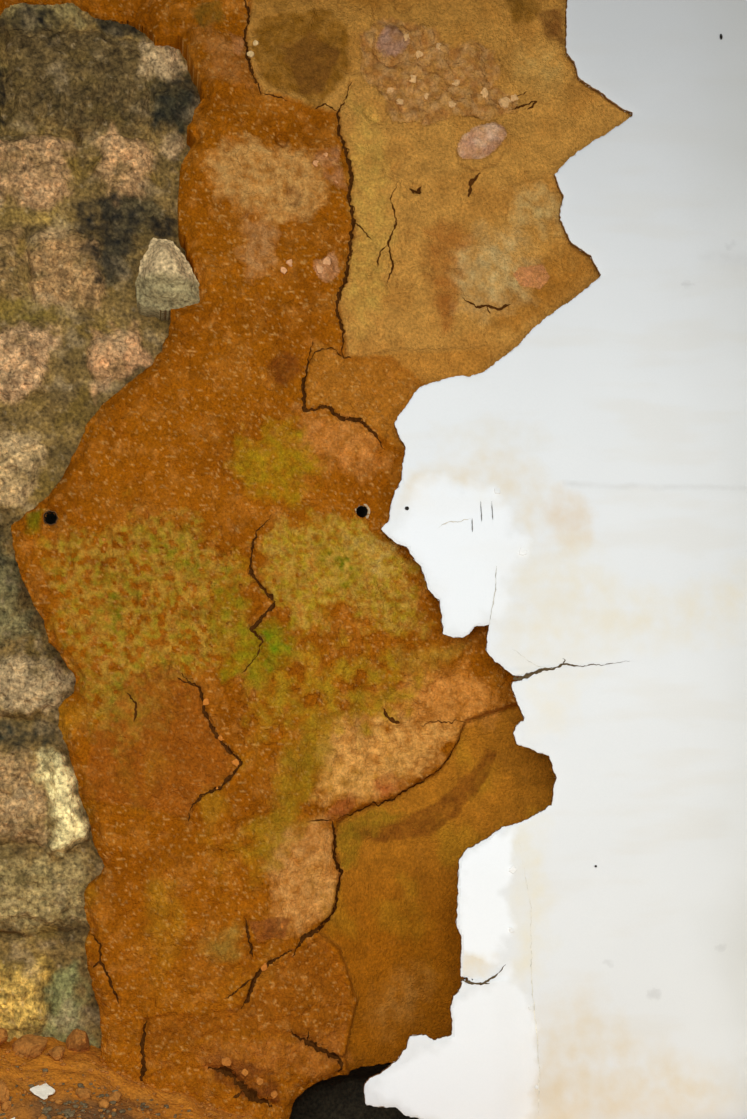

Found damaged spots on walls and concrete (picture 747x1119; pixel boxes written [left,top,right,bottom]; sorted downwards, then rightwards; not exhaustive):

flaking render [358,15,520,159]
flaking render [313,250,340,283]
crack [301,82,422,449]
flaking render [80,664,240,819]
crack [177,673,243,821]
crack [242,515,276,673]
peeling [388,471,535,636]
crack [513,650,629,681]
crack [224,708,466,1009]
peeling [367,827,543,1119]
crack [461,841,540,1118]
flaking render [30,1081,55,1100]